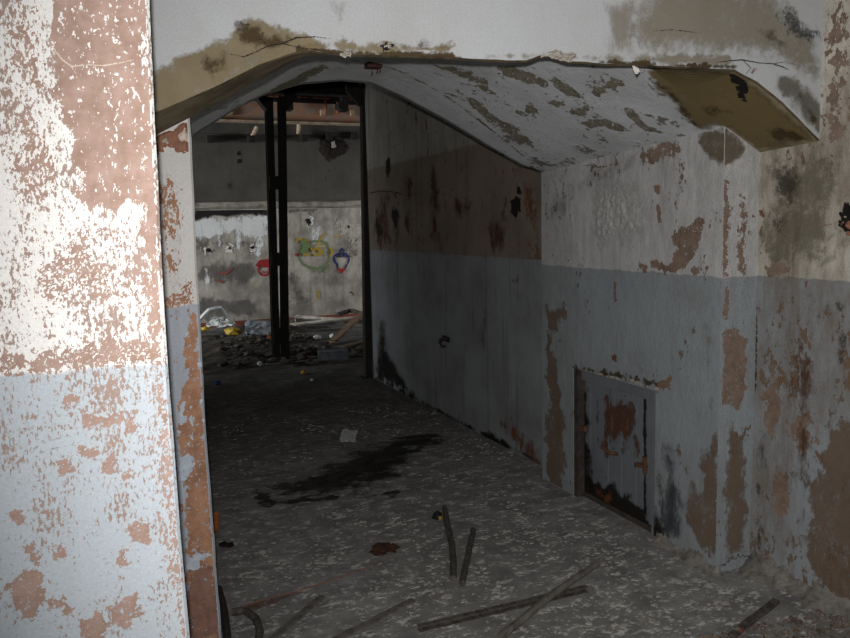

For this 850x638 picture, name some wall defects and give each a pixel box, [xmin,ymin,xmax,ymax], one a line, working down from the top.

crack [230,36,329,57]
leakage [154,20,461,112]
peeling [425,62,684,167]
leakage [600,0,820,165]
peeling [0,0,220,638]
peeling [633,217,706,280]
peeling [720,177,749,410]
leakage [777,167,796,204]
spalling [838,202,850,236]
corrosion [597,395,639,458]
peeling [686,430,749,557]
peeling [759,360,850,600]